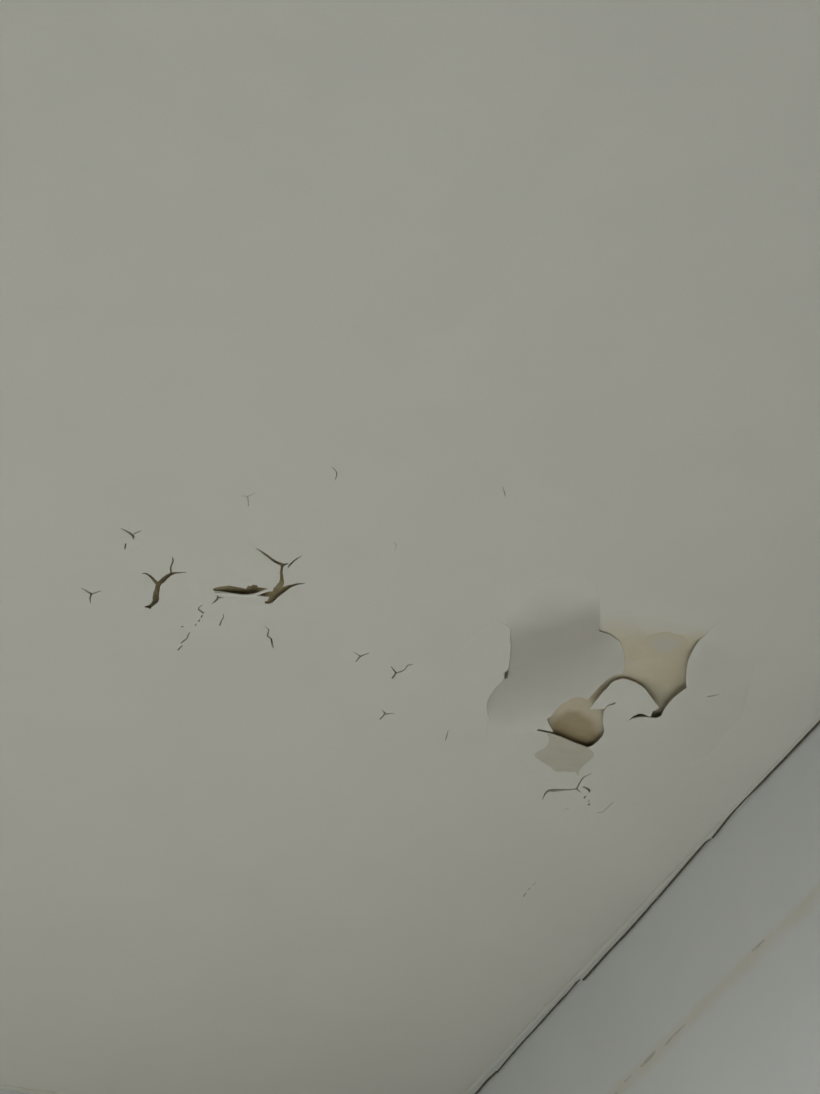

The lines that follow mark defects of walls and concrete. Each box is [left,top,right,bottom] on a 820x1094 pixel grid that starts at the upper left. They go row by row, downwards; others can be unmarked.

crack [145,557,180,608]
crack [187,548,301,636]
peeling [444,574,756,781]
crack [475,720,820,1094]